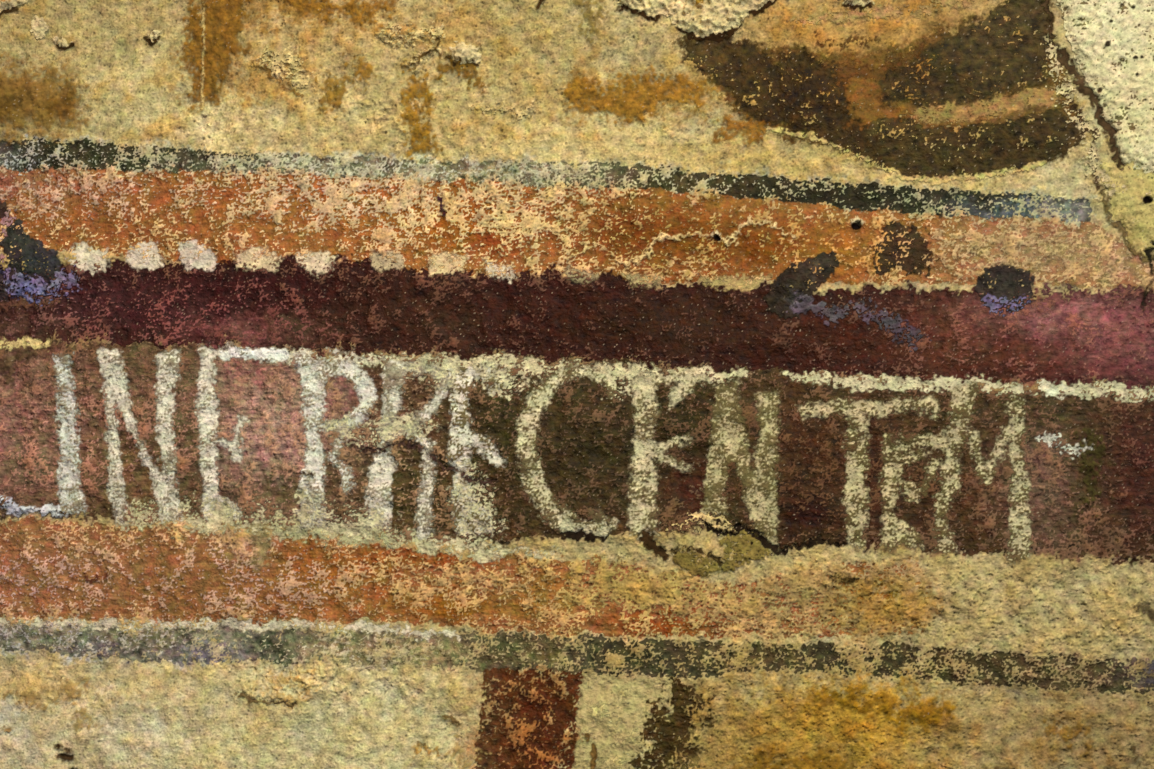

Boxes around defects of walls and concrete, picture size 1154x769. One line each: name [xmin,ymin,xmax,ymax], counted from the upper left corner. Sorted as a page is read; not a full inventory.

crack [1040,0,1154,310]
flaking render [673,529,771,581]